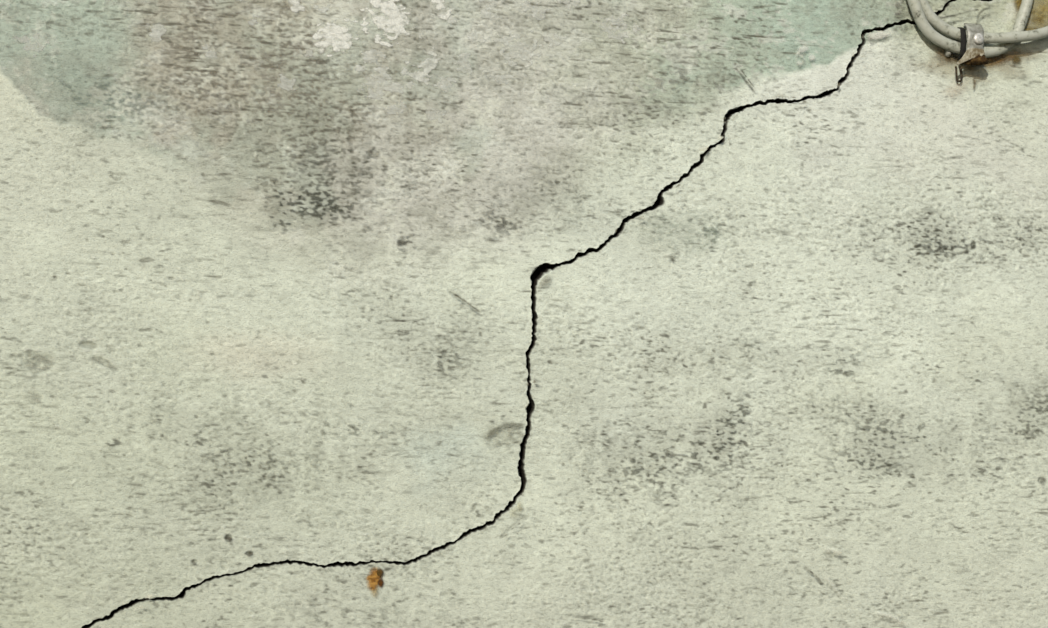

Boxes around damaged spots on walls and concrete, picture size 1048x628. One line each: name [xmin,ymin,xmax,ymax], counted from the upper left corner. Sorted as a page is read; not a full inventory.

crack [934,0,993,19]
corrosion [1015,0,1048,31]
crack [81,19,916,628]
corrosion [367,569,383,590]